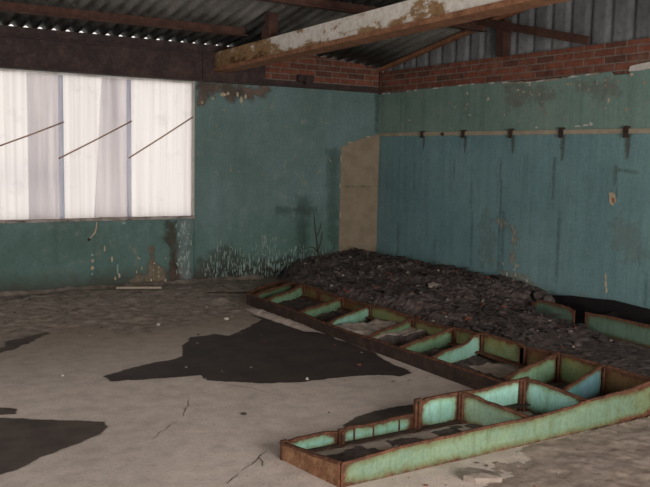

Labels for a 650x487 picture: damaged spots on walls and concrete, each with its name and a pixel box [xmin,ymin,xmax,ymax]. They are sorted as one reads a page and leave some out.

flaking render [629,62,650,76]
peeling [196,82,270,106]
water stain [165,223,189,280]